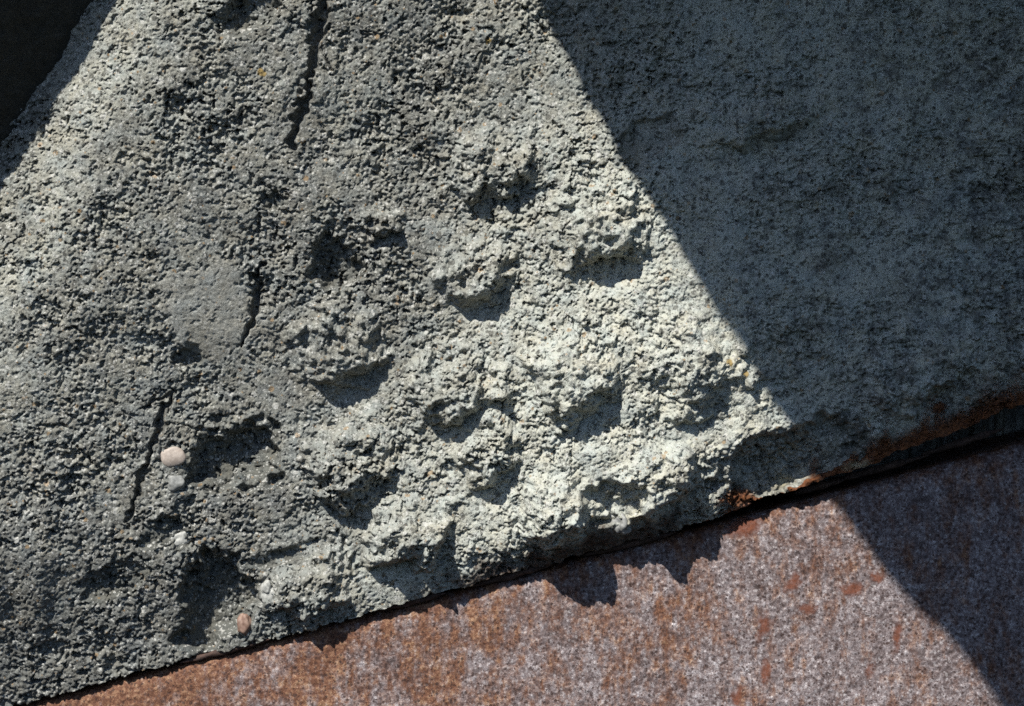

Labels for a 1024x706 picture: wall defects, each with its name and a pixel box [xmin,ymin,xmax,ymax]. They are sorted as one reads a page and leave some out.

crack [284,0,335,152]
crack [123,387,177,524]
corrosion [467,520,679,586]
corrosion [719,489,762,511]
corrosion [730,519,757,534]
corrosion [779,387,1024,493]